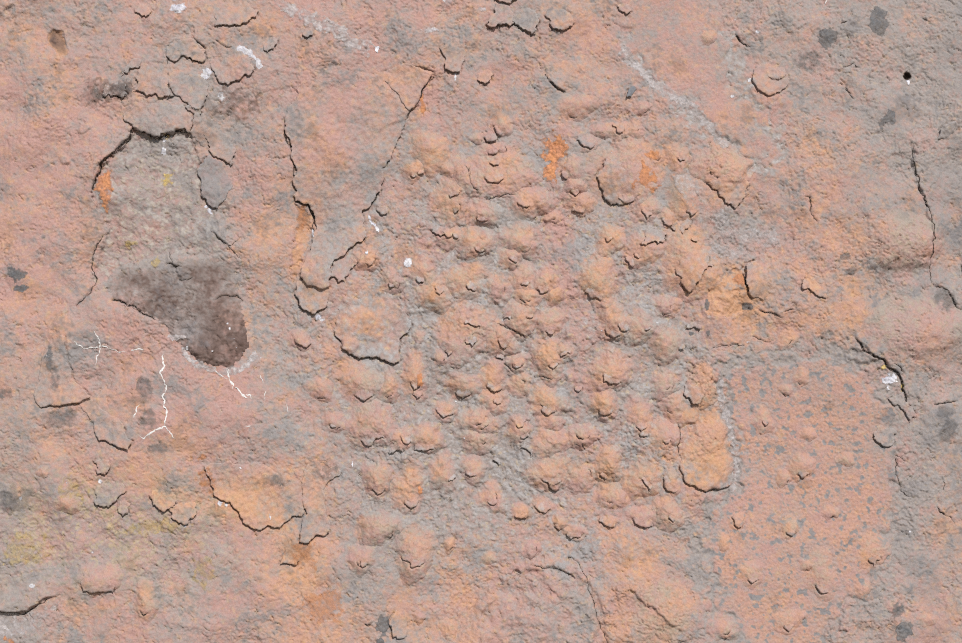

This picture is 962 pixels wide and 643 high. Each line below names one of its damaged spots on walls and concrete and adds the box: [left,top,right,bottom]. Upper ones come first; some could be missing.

corrosion [94,171,114,213]
spalling [91,36,254,368]
peeling [284,61,434,314]
corrosion [541,130,569,182]
crack [912,148,962,310]
crack [855,337,955,413]